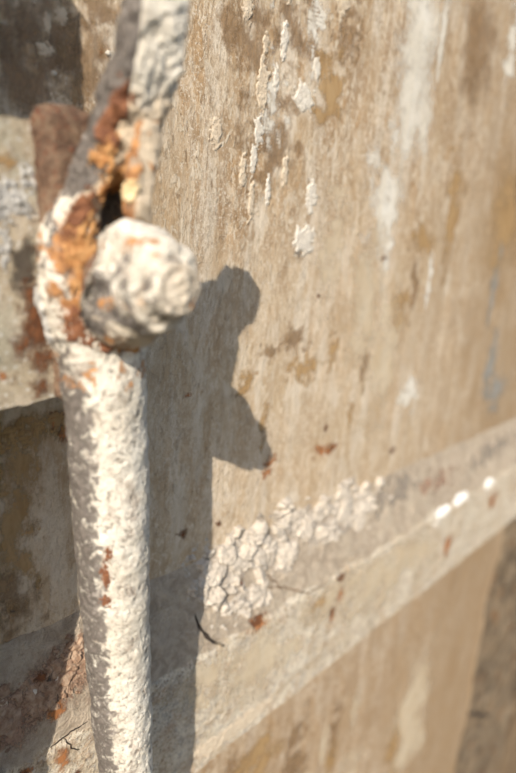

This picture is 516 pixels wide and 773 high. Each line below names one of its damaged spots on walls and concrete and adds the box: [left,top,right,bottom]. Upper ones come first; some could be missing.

rust [98,546,113,609]
spalling [178,467,453,631]
rust [56,748,69,771]